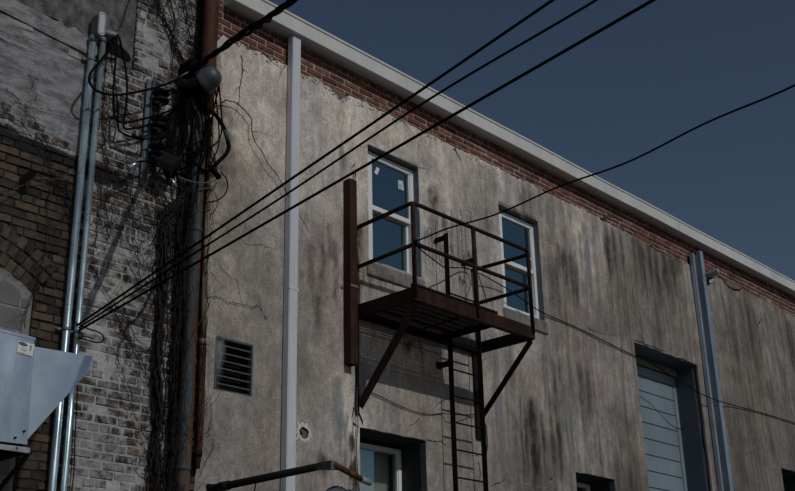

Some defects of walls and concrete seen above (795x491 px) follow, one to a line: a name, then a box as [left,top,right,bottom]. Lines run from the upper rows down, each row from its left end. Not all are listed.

spalling [105,40,131,61]
crack [220,56,245,142]
peeling [0,101,71,150]
spalling [326,482,357,491]